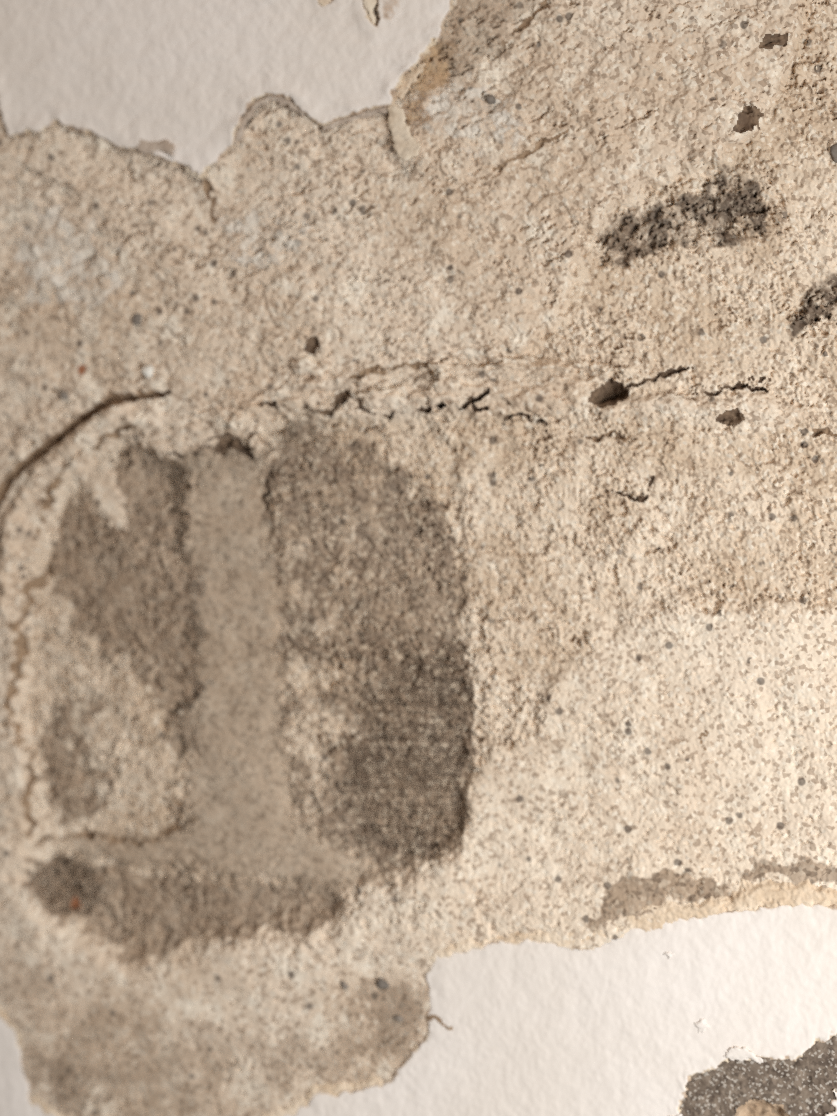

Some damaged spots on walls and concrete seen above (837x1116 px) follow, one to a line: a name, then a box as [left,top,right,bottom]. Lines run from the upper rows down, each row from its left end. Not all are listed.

flaking render [290,356,331,378]
crack [259,358,548,432]
flaking render [425,391,461,408]
flaking render [503,387,568,415]
crack [624,366,771,396]
crack [585,430,632,442]
crack [813,427,837,438]
crack [611,475,655,503]
water stain [23,415,477,964]
flaking render [273,578,370,844]
flaking render [625,871,837,933]
flaking render [677,1035,837,1116]